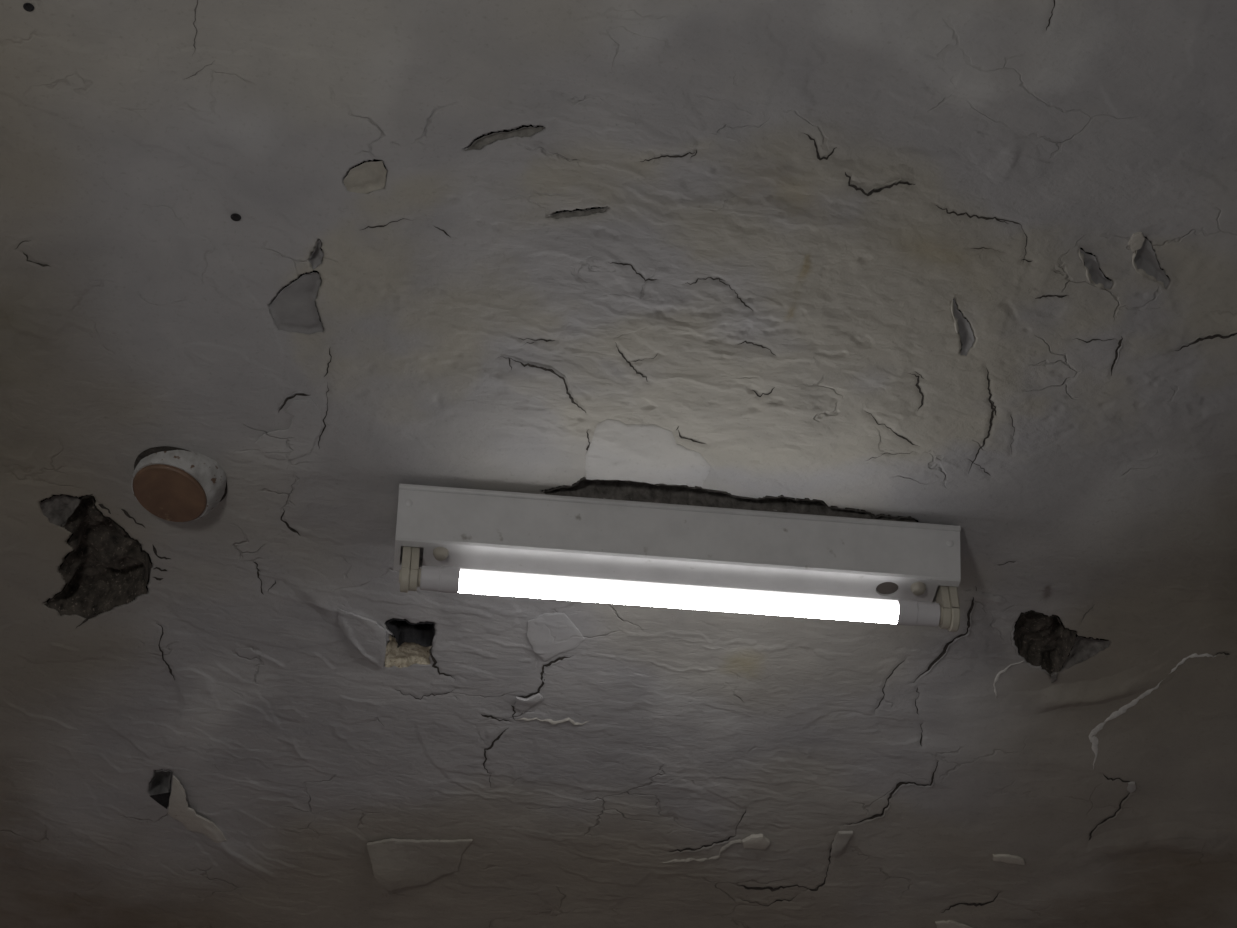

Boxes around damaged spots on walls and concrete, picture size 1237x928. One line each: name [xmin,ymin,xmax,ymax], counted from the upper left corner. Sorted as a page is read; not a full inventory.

crack [804,133,915,196]
flaking render [269,240,324,334]
crack [504,338,590,451]
crack [969,368,1015,475]
flaking render [543,477,917,523]
spalling [40,494,170,628]
flaking render [337,608,436,670]
spalling [1011,610,1111,683]
crack [481,656,589,782]
crack [737,588,977,906]
crack [1089,652,1230,842]
flaking render [149,769,227,843]